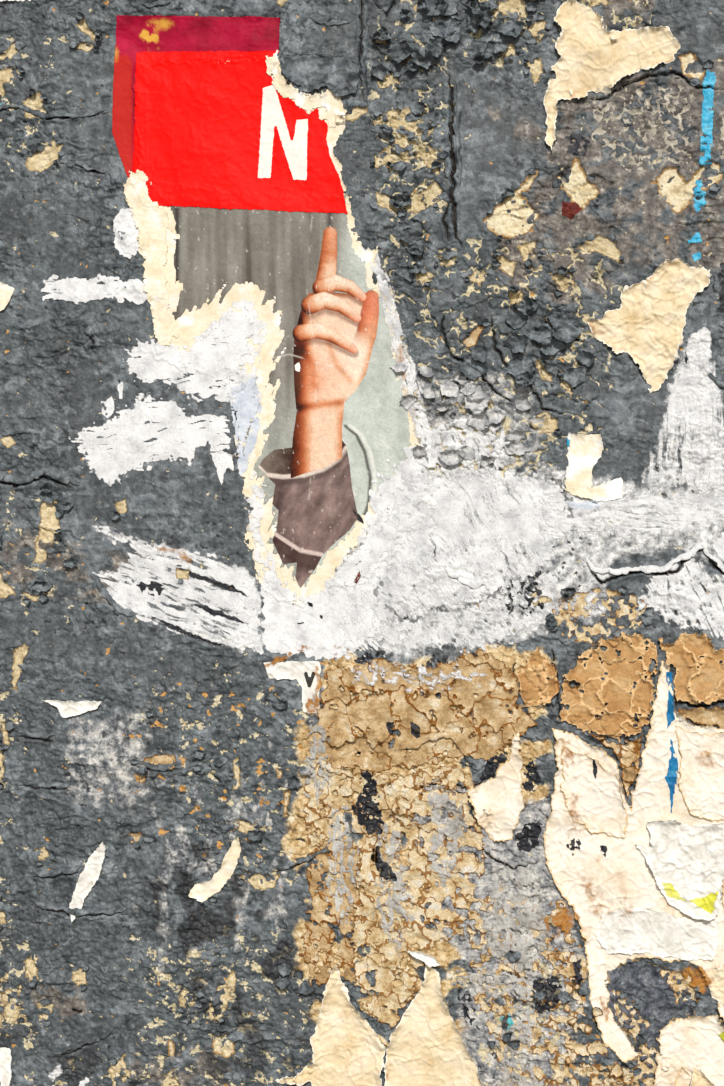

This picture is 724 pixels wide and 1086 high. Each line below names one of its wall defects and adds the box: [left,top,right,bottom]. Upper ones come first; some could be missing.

crack [357,0,365,99]
crack [442,74,462,246]
peeling [591,52,724,214]
peeling [280,0,600,456]
peeling [575,233,625,264]
peeling [411,445,494,467]
peeling [190,750,241,793]
peeling [237,819,264,841]
peeling [233,868,280,895]
peeling [275,584,724,1086]